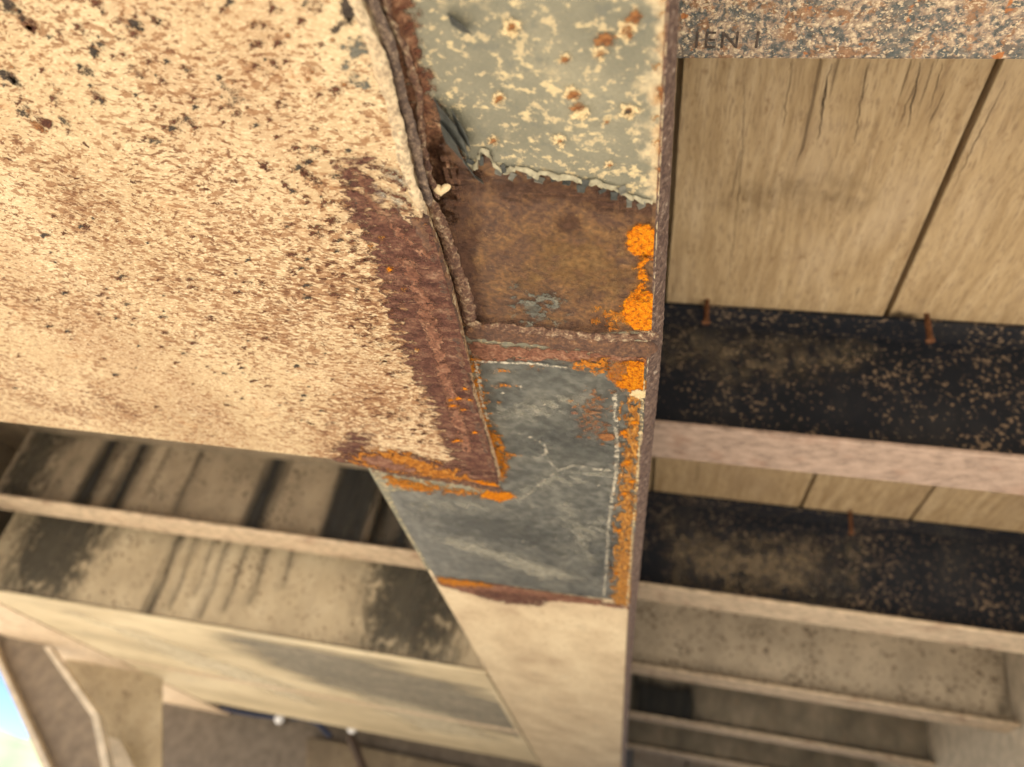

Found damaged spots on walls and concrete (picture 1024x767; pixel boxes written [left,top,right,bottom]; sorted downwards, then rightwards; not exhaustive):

peeling [447,12,472,35]
peeling [433,96,653,210]
corrosion [327,0,659,610]
water stain [669,527,821,596]